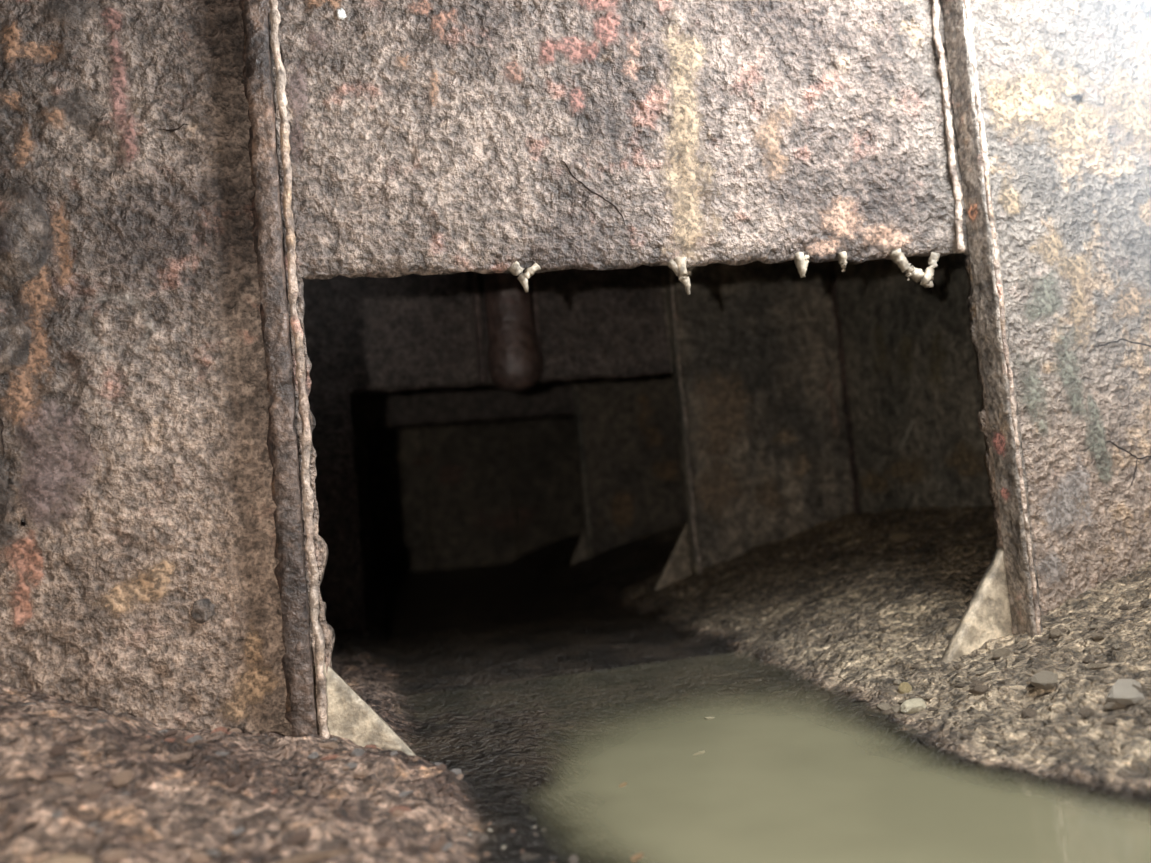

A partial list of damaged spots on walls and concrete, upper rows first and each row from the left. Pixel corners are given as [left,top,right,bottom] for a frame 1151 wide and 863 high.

corrosion [3,22,57,59]
corrosion [542,0,620,61]
corrosion [623,39,639,76]
corrosion [571,89,584,111]
corrosion [15,128,32,164]